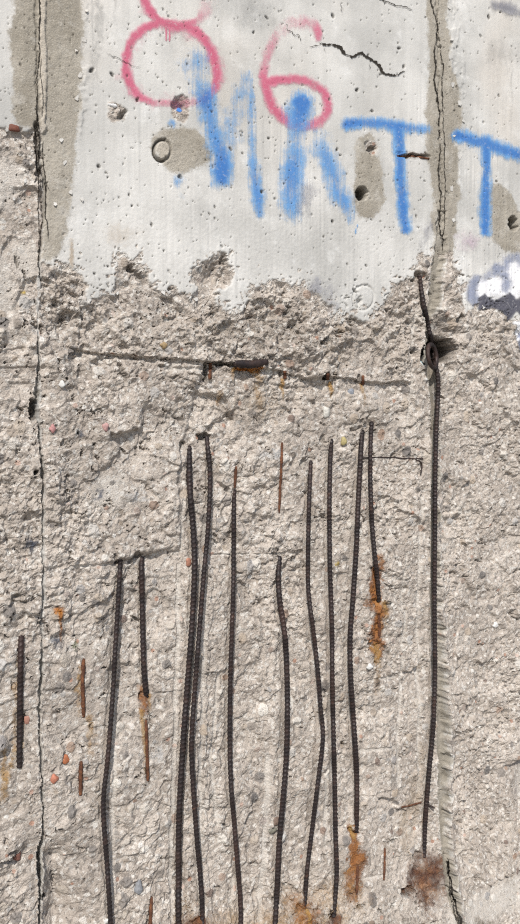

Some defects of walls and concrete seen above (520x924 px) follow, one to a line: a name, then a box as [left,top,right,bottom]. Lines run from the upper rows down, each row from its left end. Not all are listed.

crack [286,24,405,76]
crack [35,0,49,281]
spalling [364,140,378,155]
crack [383,0,447,250]
spalling [0,127,45,924]
spalling [38,251,520,924]
rust [363,555,387,660]
rust [344,825,367,899]
rust [401,854,444,904]
crack [447,858,464,924]